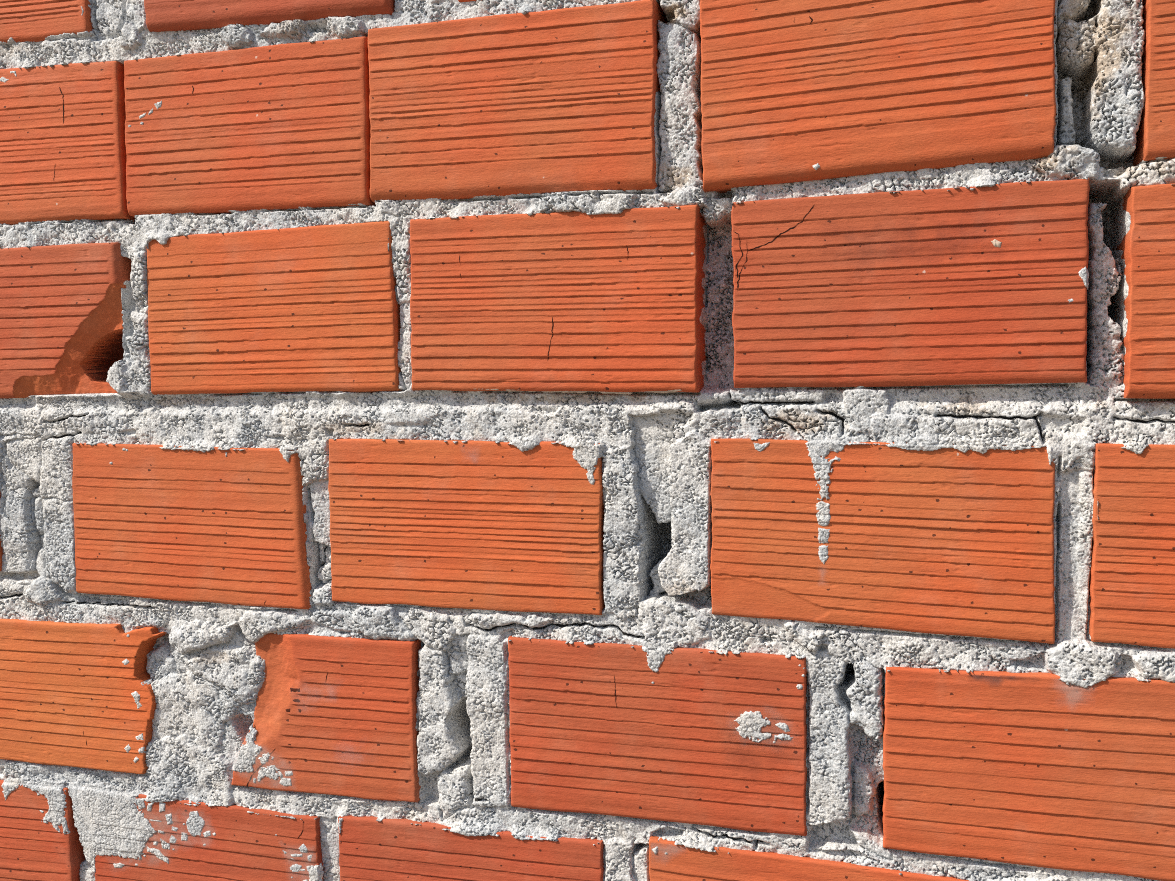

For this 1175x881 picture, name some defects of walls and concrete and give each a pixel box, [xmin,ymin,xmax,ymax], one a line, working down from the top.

crack [735,205,814,289]
spalling [13,283,125,398]
crack [730,394,844,430]
crack [937,414,1043,441]
crack [1114,416,1175,424]
peeling [253,752,293,786]